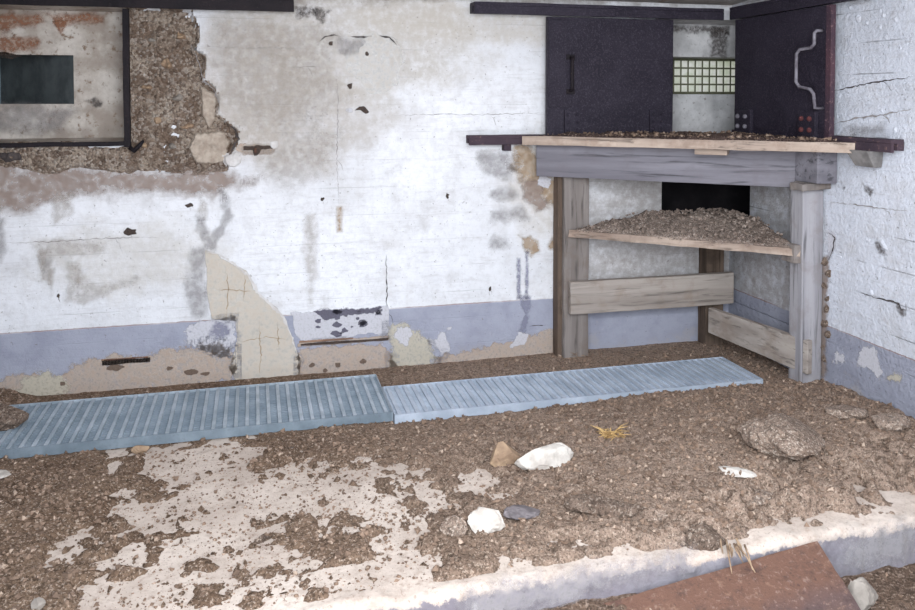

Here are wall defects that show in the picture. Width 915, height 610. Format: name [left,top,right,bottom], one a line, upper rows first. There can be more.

rust [0,13,42,53]
rust [53,13,103,34]
flaking render [0,8,273,176]
crack [840,77,908,90]
crack [834,109,910,125]
peeling [0,251,553,396]
peeling [857,346,901,382]